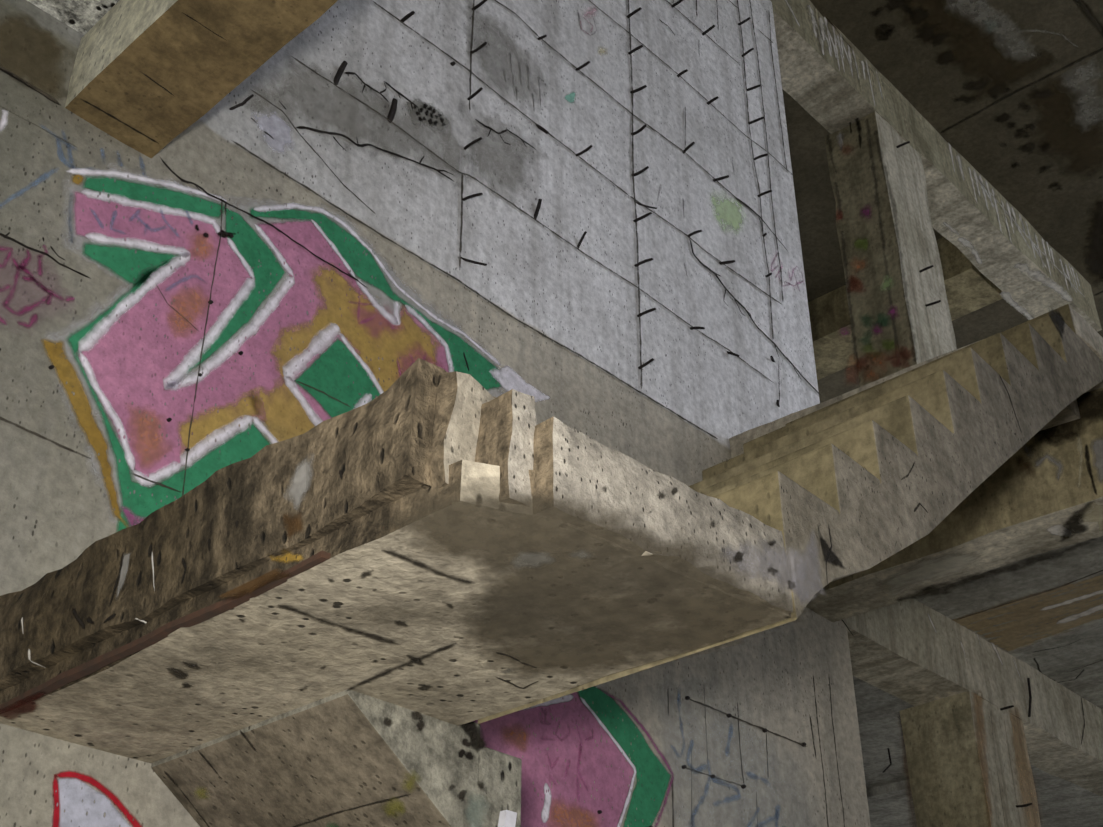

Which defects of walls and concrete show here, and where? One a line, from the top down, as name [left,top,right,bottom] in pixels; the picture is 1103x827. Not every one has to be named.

crack [251,101,453,181]
crack [345,72,420,113]
crack [475,119,535,149]
damp [785,0,924,136]
damp [872,0,1076,103]
damp [996,62,1103,176]
damp [849,118,916,364]
damp [937,135,1103,320]
crack [690,240,819,394]
damp [1049,309,1065,339]
damp [887,390,1103,600]